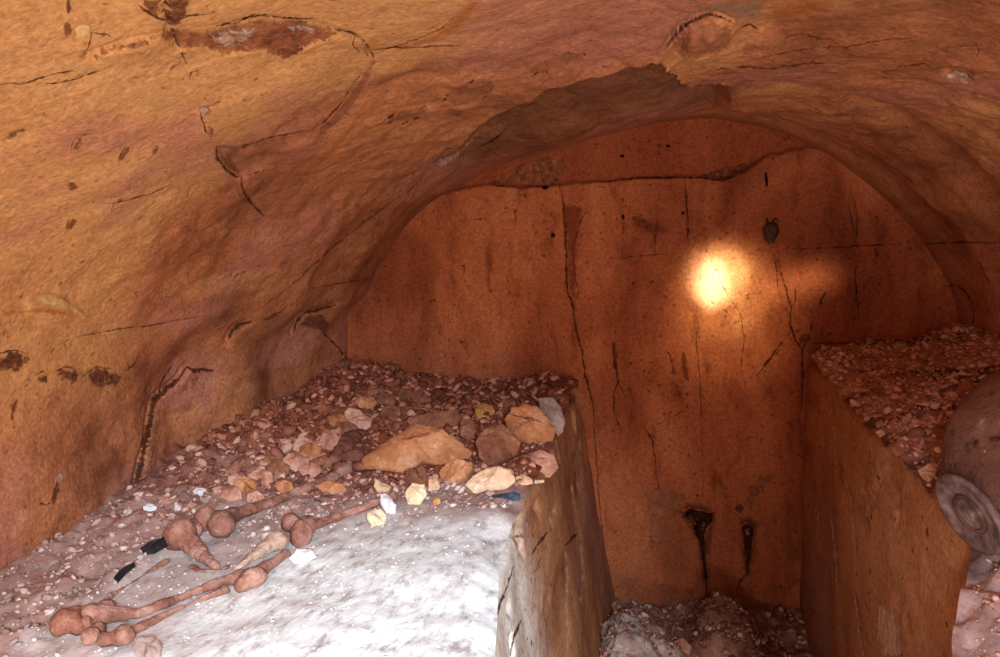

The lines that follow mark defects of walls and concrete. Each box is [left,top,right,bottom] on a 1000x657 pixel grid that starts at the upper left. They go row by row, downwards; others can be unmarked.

spalling [94,13,337,60]
crack [136,366,213,480]
crack [558,180,704,532]
crack [602,184,896,421]